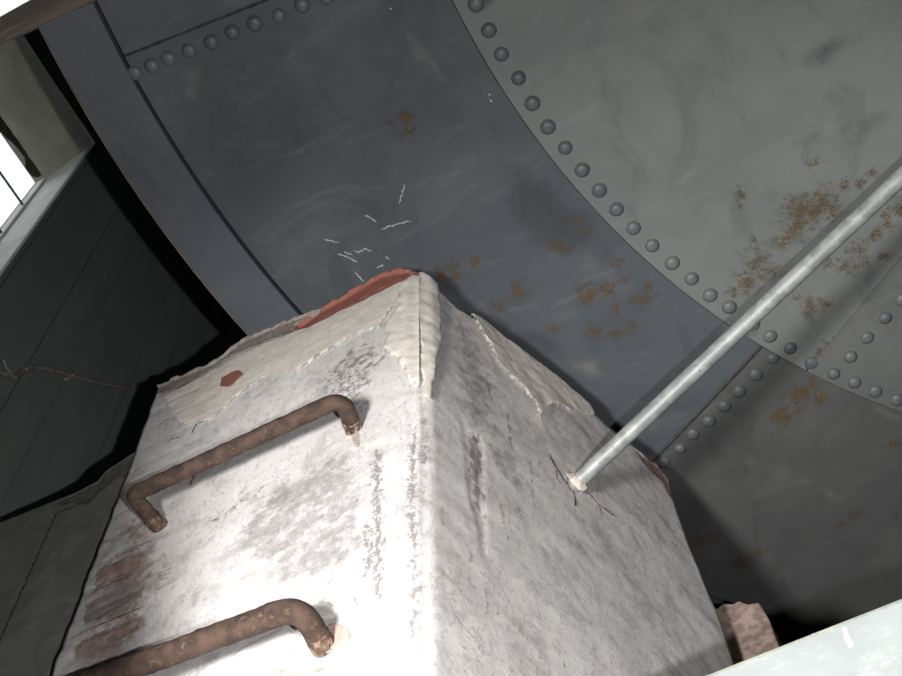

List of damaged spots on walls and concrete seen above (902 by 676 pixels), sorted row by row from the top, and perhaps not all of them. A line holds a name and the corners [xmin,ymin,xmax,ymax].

peeling [472,313,594,423]
crack [549,454,615,516]
peeling [709,600,902,676]